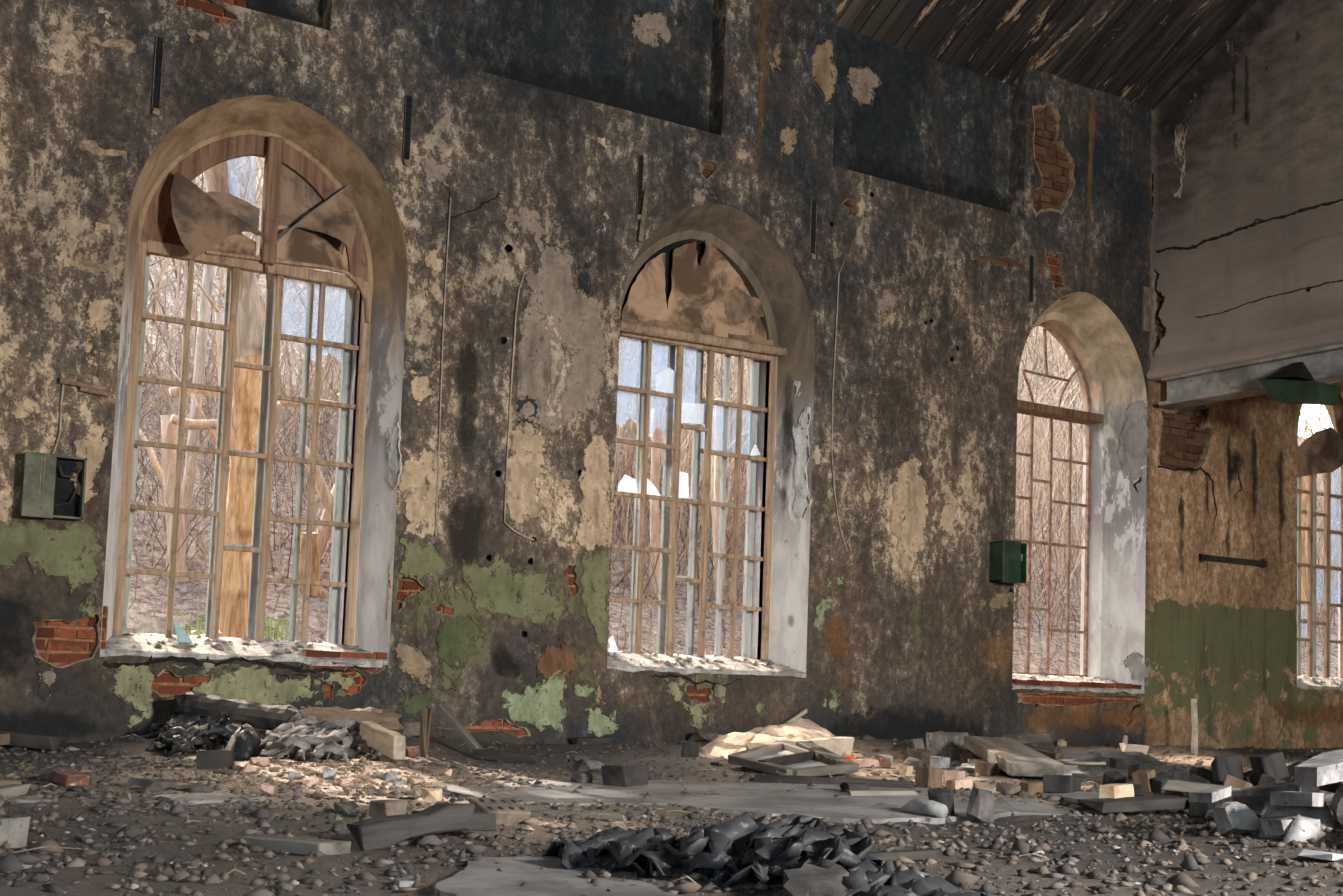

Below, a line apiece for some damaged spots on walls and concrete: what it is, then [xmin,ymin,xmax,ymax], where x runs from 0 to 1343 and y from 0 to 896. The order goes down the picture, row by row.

spalling [174,0,246,50]
flaking render [630,11,672,48]
flaking render [809,39,882,108]
flaking render [776,124,798,167]
spalling [1032,101,1076,217]
crack [1151,120,1343,253]
flaking render [78,291,114,386]
crack [1196,280,1343,318]
flaking render [0,393,43,423]
flaking render [69,421,108,503]
flaking render [109,204,620,738]
peeling [0,520,108,700]